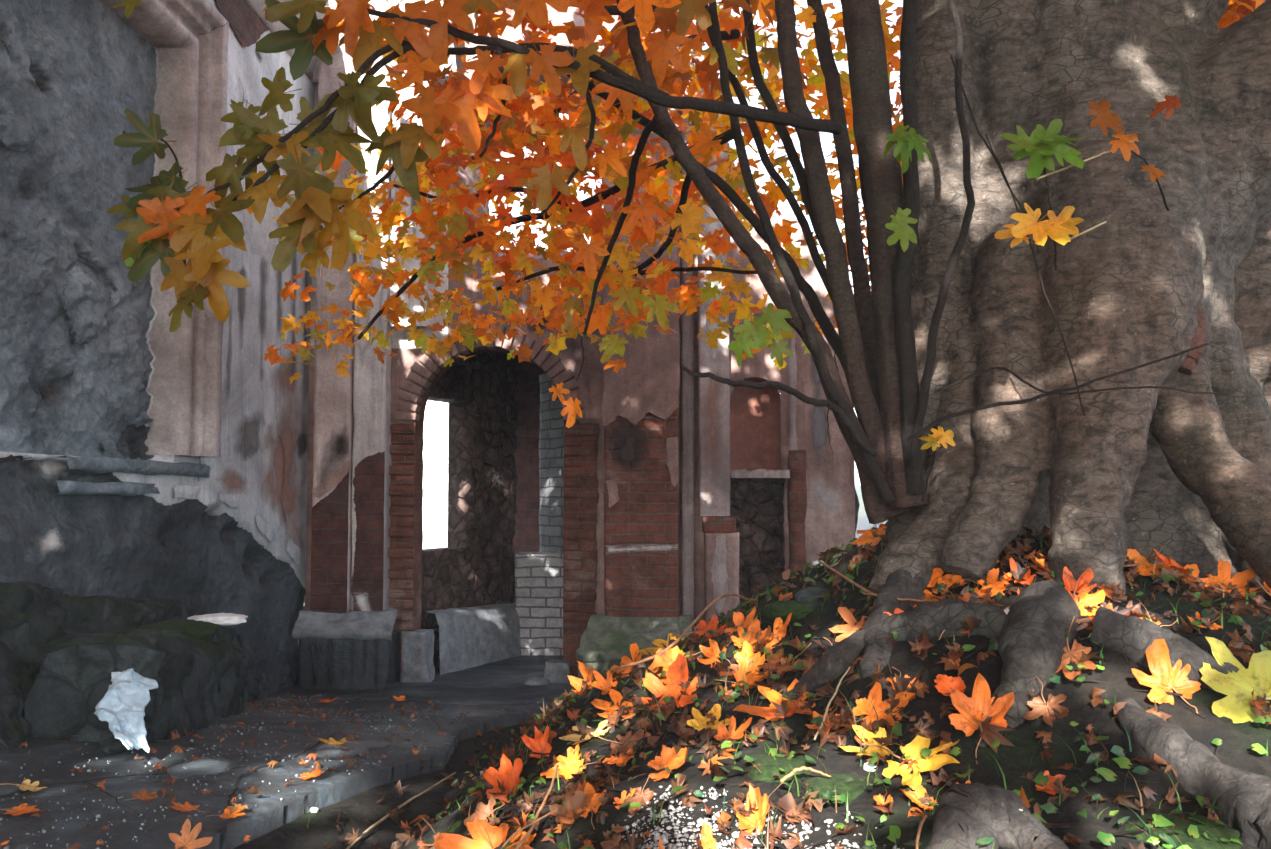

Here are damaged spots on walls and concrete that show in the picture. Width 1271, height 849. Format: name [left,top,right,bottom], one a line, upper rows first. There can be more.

leakage [227,147,280,196]
leakage [251,197,307,374]
flaking render [602,384,680,426]
flaking render [174,485,201,499]
flaking render [311,459,349,498]
flaking render [605,479,620,508]
flaking render [666,437,678,487]